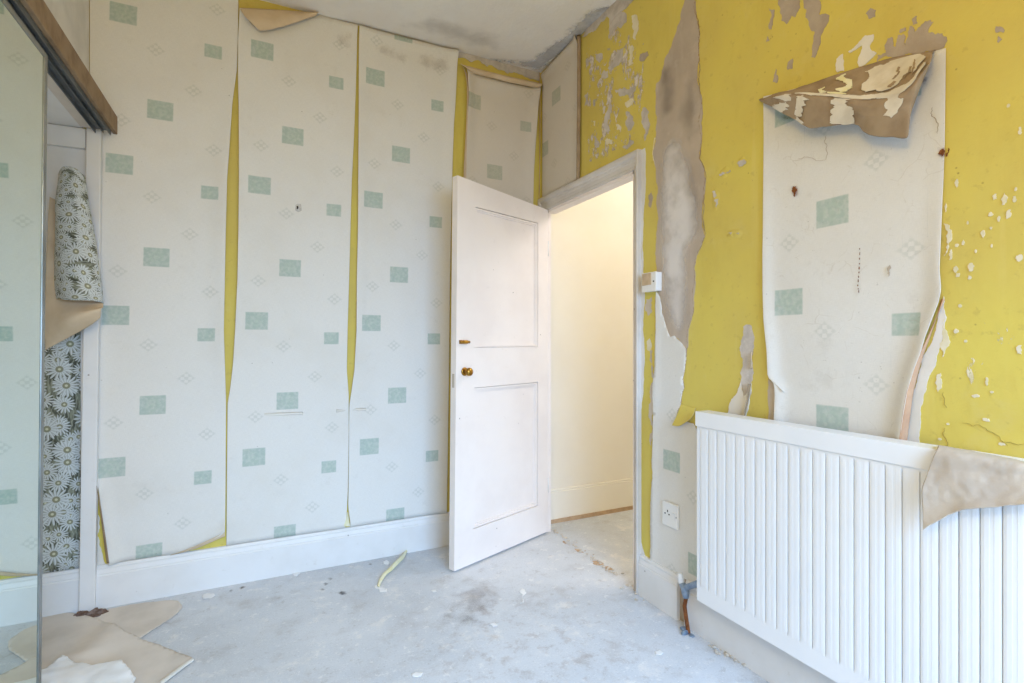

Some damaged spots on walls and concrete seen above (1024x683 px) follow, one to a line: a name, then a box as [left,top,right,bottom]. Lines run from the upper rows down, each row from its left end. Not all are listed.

peeling [766,0,829,58]
peeling [583,0,706,384]
peeling [944,205,977,280]
peeling [981,187,1017,248]
peeling [740,324,755,398]
peeling [940,318,967,356]
peeling [966,358,994,398]